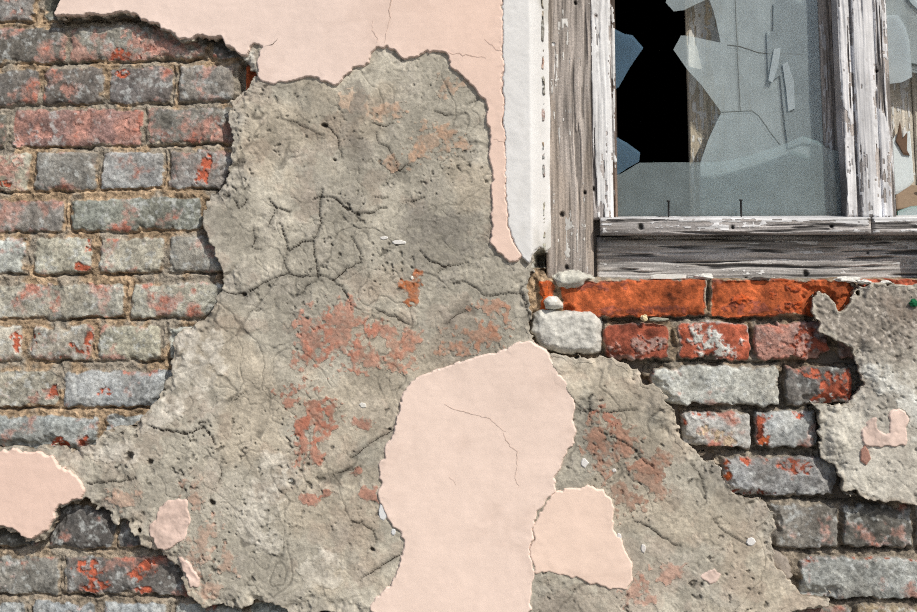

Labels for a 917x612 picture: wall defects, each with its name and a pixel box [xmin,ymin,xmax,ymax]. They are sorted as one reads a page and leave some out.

peeling [548,10,580,93]
spalling [0,113,59,187]
peeling [576,0,917,266]
spalling [74,262,91,271]
crack [227,197,377,305]
peeling [0,296,289,612]
peeling [370,194,917,612]